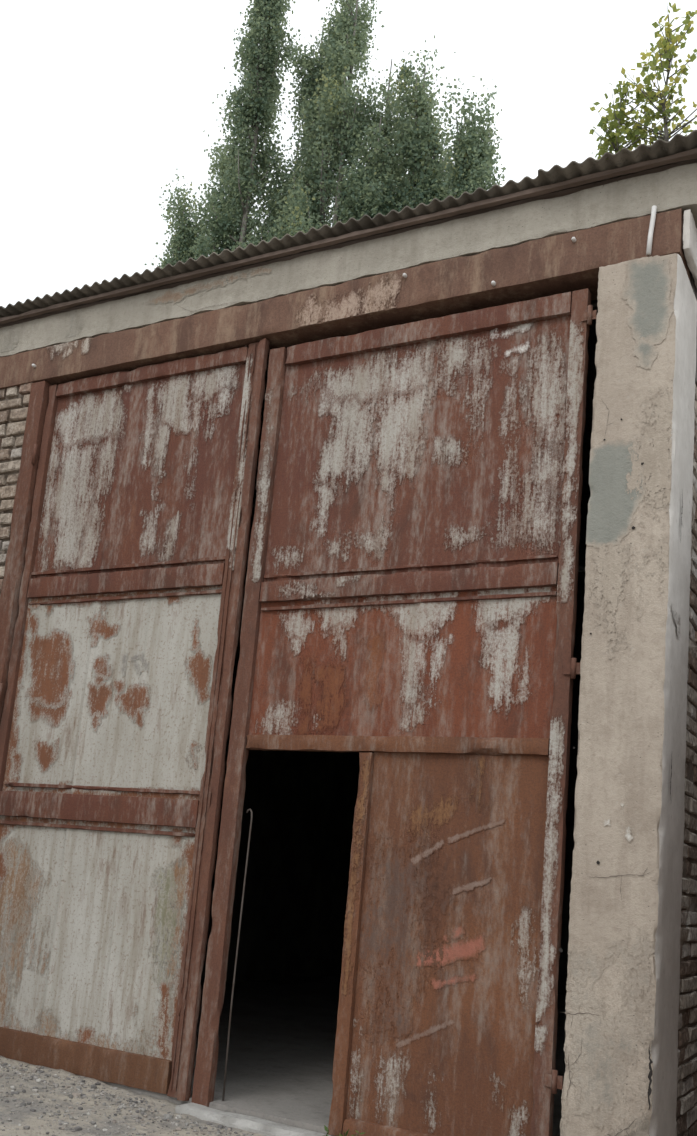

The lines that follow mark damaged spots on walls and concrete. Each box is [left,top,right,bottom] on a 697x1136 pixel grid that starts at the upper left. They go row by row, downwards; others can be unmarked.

peeling [37,319,585,735]
leakage [589,387,673,659]
corrosion [2,586,222,800]
corrosion [0,816,196,1061]
corrosion [341,759,371,996]